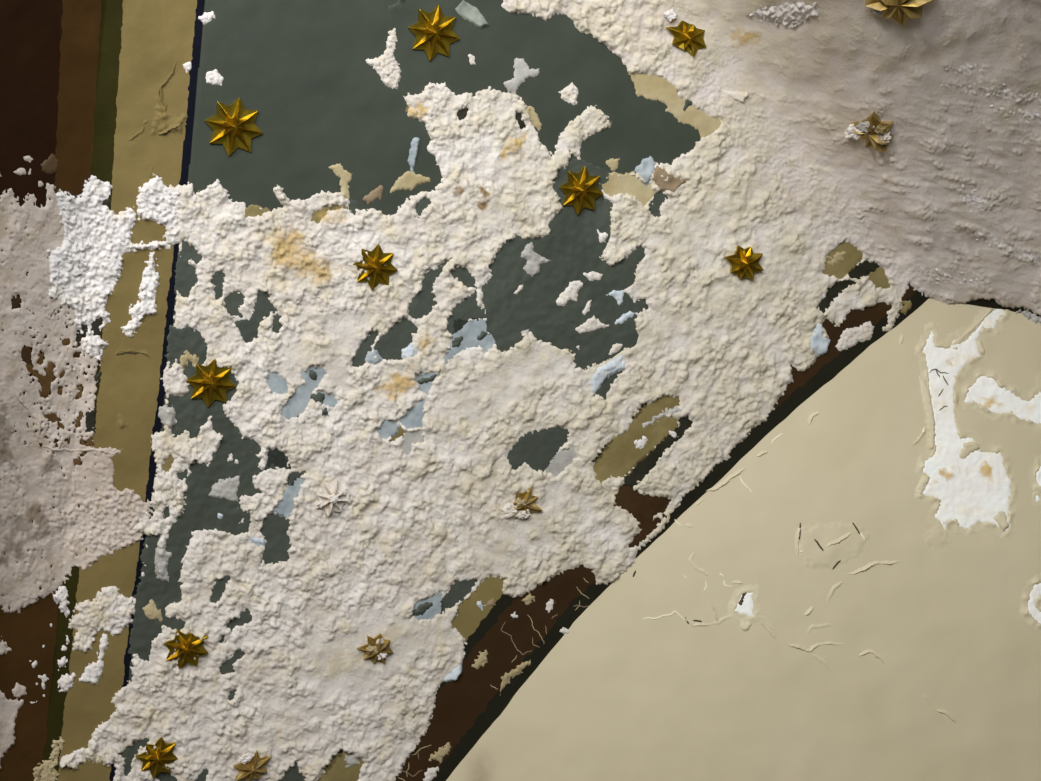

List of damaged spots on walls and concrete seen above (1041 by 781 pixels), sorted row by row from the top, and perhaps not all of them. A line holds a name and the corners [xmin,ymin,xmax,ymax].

peeling [455,0,489,28]
spalling [365,28,401,89]
spalling [14,154,59,175]
spalling [0,183,264,661]
spalling [60,58,912,781]
spalling [914,307,1041,544]
spalling [1019,572,1041,632]
spalling [0,660,49,769]
spalling [33,737,65,781]